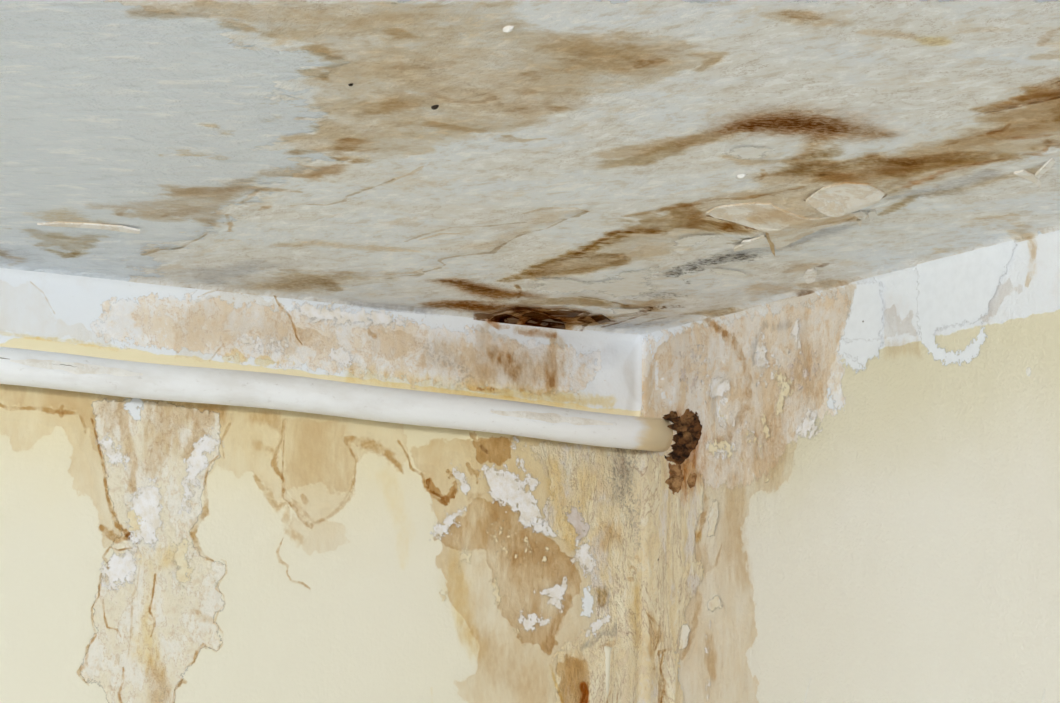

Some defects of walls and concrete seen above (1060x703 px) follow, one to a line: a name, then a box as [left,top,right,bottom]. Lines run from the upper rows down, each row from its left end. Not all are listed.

peeling [37,221,140,234]
peeling [90,0,1060,400]
water stain [424,254,756,314]
water stain [838,278,884,374]
water stain [915,240,1017,366]
water stain [100,477,164,591]
peeling [80,398,226,703]
water stain [178,428,228,514]
water stain [430,463,471,540]
water stain [479,436,611,647]
corrosion [663,409,702,494]
peeling [521,289,851,703]